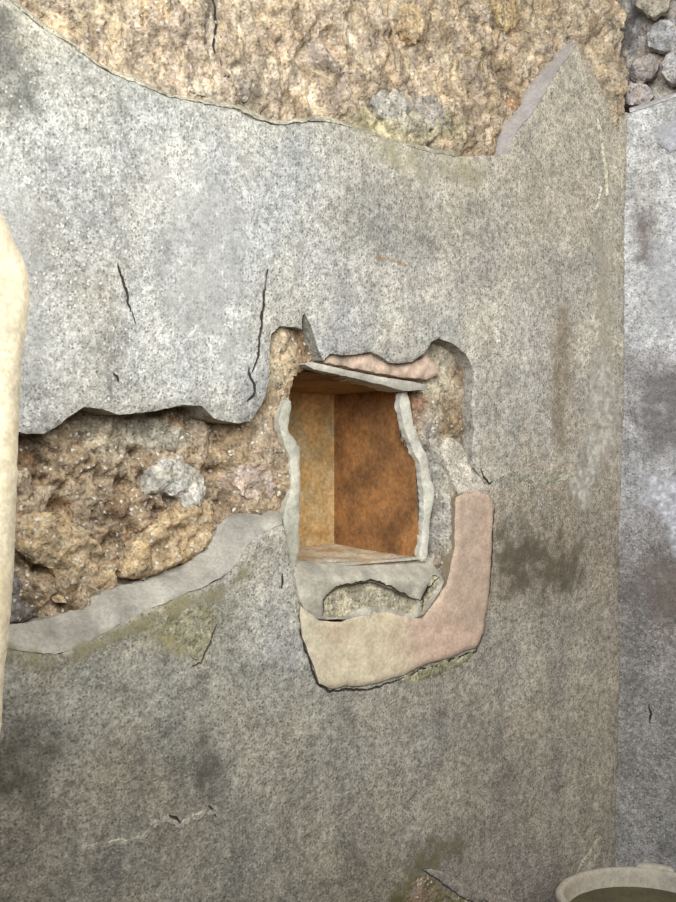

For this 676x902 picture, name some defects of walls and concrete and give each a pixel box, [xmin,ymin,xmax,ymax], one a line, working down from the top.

crack [211,0,219,62]
flaking render [10,0,676,210]
crack [117,263,136,324]
crack [247,269,268,402]
flaking render [7,327,580,654]
leakage [640,475,676,556]
flaking render [161,605,217,666]